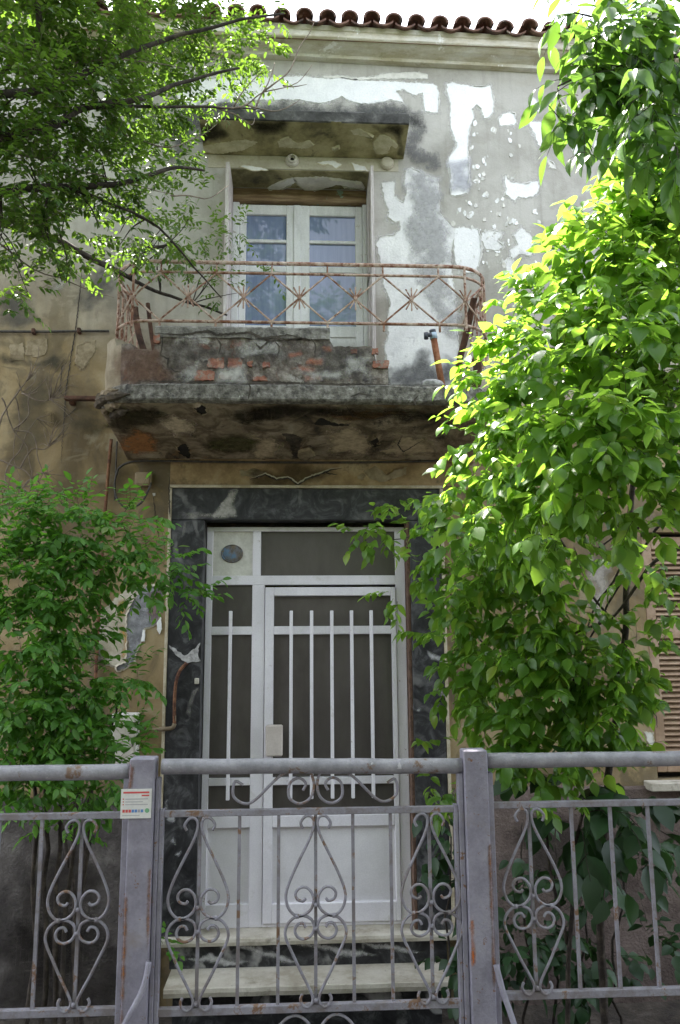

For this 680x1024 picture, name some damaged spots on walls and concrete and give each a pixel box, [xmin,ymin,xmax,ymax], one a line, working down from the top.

peeling [169,72,542,386]
damp [253,102,470,335]
damp [388,351,454,386]
damp [77,409,194,436]
damp [233,406,438,459]
crack [250,467,341,485]
flaking render [98,584,164,672]